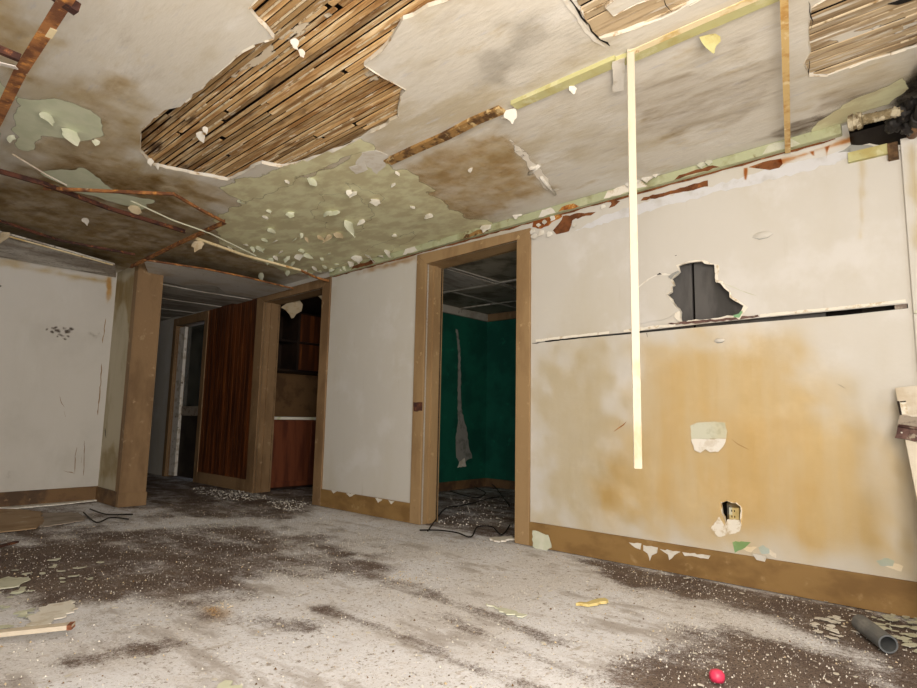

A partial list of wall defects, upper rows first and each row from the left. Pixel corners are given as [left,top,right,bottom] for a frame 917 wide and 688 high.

crack [563,0,610,47]
flaking render [577,0,700,37]
flaking render [803,0,917,77]
peeling [0,96,104,151]
peeling [40,168,155,215]
flaking render [139,0,493,280]
peeling [509,139,558,196]
hole [545,260,862,342]
peeling [690,422,749,453]
peeling [630,543,710,560]
spalling [711,500,776,562]